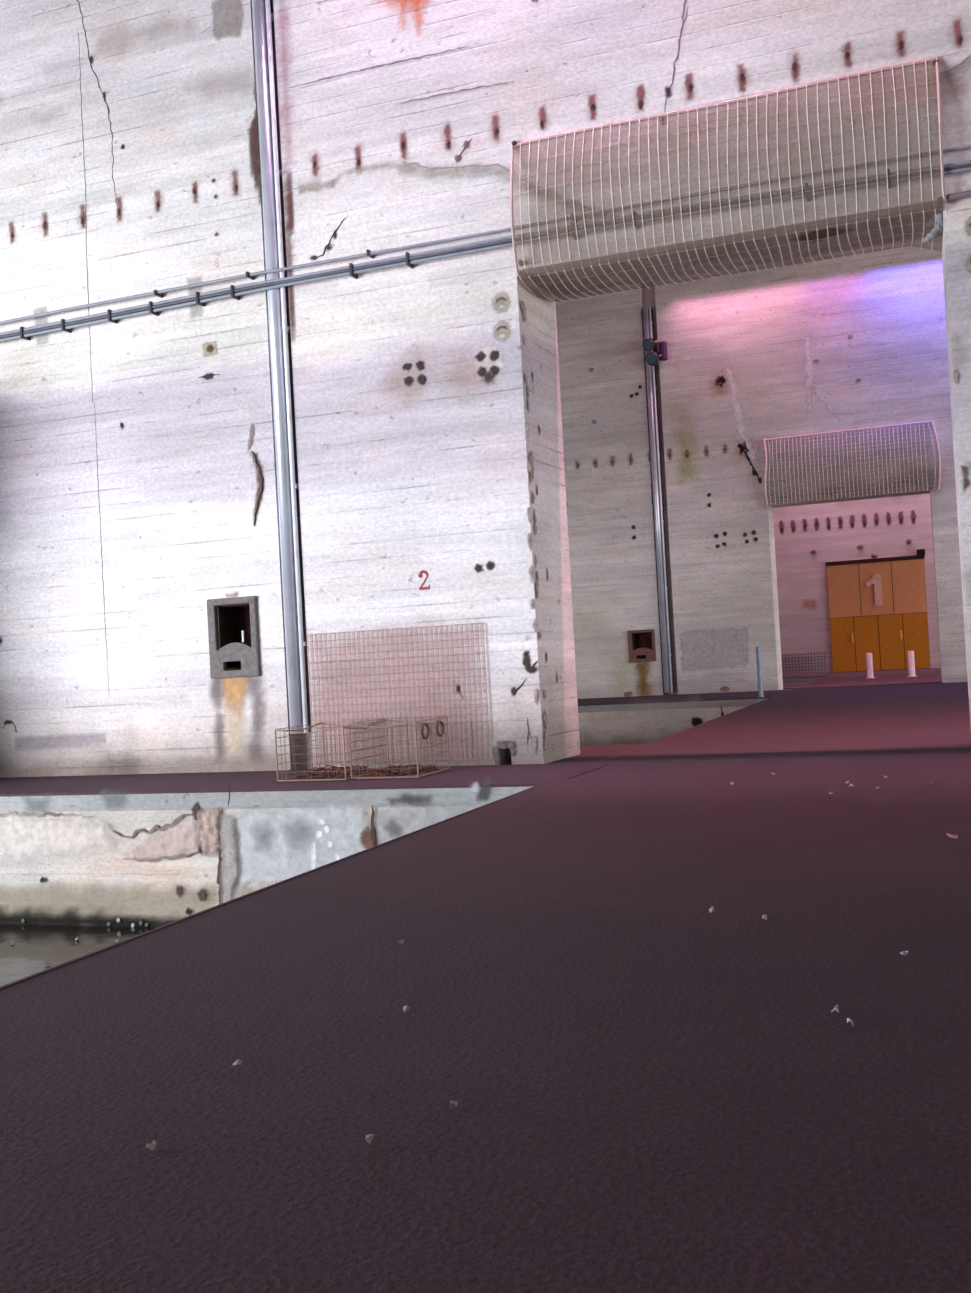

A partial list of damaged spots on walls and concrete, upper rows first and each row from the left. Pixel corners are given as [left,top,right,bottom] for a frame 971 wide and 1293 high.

crack [661,0,687,125]
crack [76,0,118,690]
corrosion [212,677,261,755]
peeling [0,803,239,904]
leakage [292,819,340,869]
leakage [0,889,211,928]